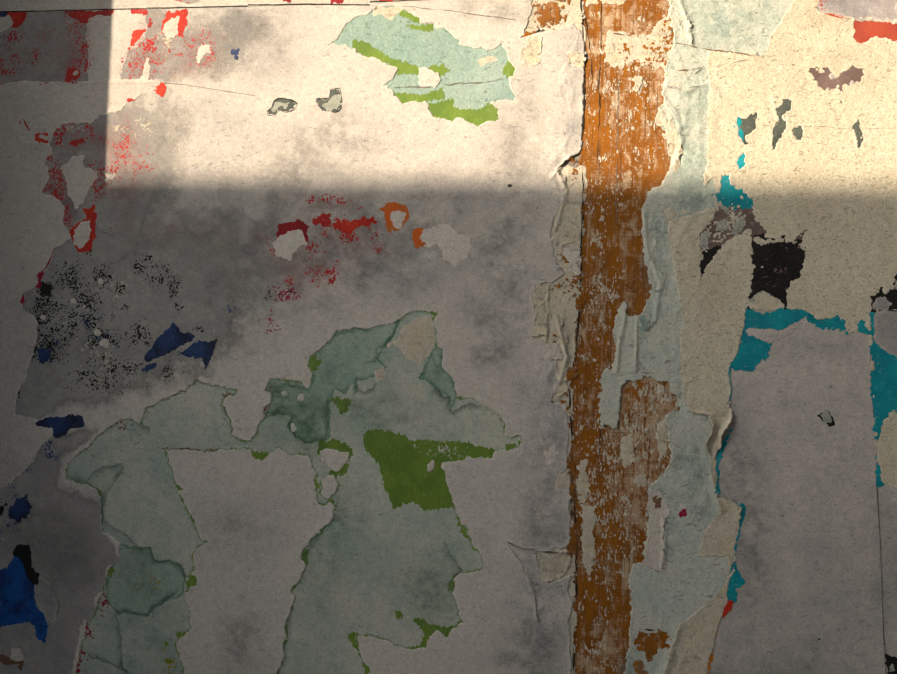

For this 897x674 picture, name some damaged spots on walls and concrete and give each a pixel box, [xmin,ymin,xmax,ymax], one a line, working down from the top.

peeling [0,10,114,85]
peeling [115,0,257,97]
peeling [265,194,472,288]
peeling [263,276,302,335]
peeling [806,312,871,335]
peeling [0,98,245,674]
peeling [817,409,835,427]
peeling [714,428,733,494]
peeling [732,501,746,551]
peeling [721,562,745,619]
crack [876,447,887,674]
peeling [884,654,897,674]